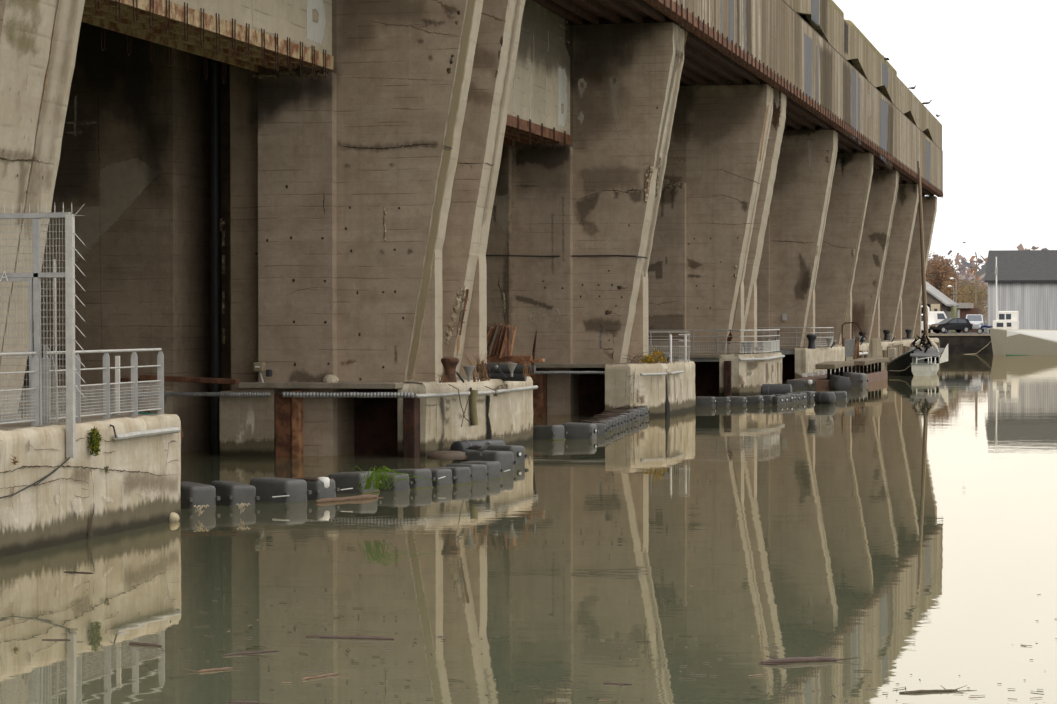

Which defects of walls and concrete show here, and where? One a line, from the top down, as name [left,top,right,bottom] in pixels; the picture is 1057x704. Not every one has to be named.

crack [0,156,53,164]
crack [344,108,494,167]
spalling [644,156,683,204]
rust [759,85,781,160]